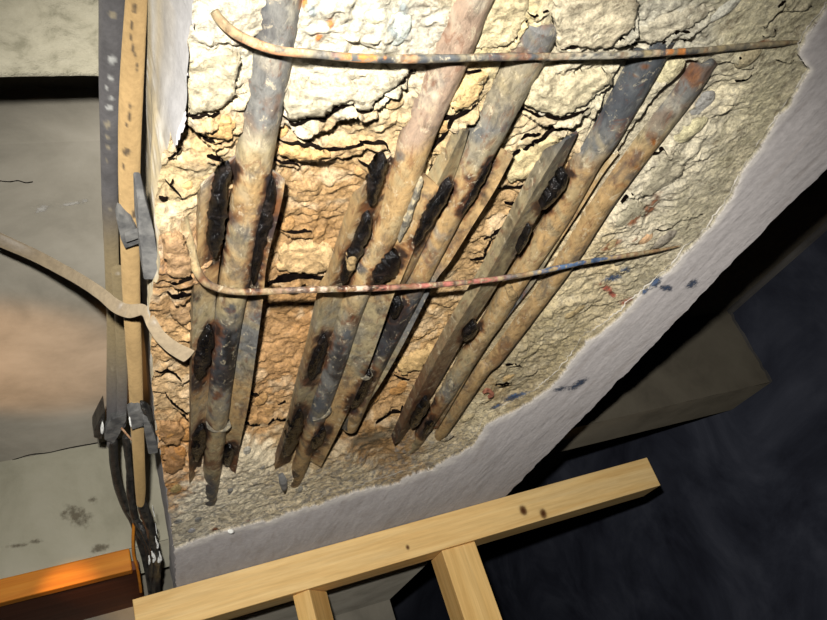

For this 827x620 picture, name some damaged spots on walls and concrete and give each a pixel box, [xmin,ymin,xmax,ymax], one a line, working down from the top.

crack [465,67,482,75]
crack [186,111,225,162]
crack [274,69,416,167]
crack [428,103,478,171]
crack [512,107,589,157]
crack [159,179,183,201]
crack [279,227,312,235]
crack [469,184,524,261]
crack [167,276,193,299]
crack [268,273,324,284]
spalling [149,0,827,549]
crack [495,363,522,387]